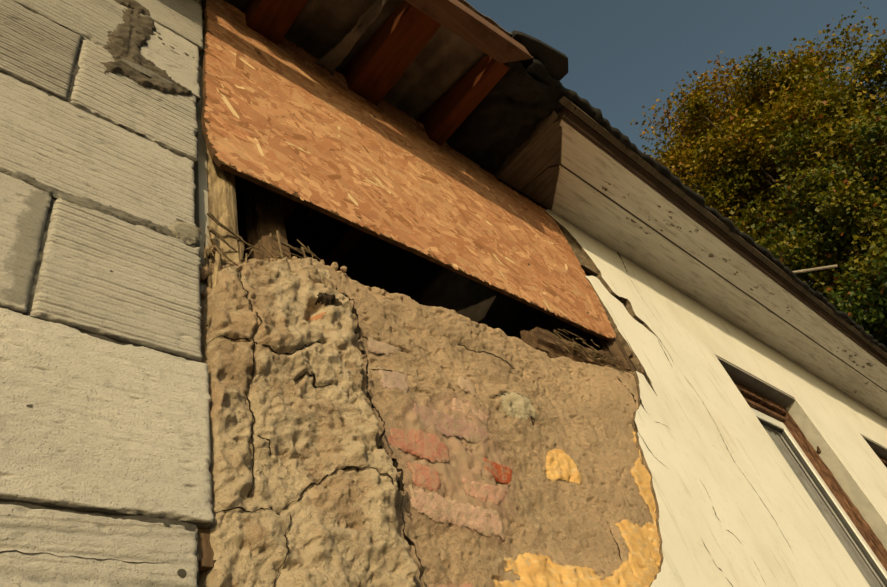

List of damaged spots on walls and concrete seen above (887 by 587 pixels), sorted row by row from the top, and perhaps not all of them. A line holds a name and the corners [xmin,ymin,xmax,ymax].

flaking render [367,337,401,356]
crack [457,344,514,369]
crack [201,270,425,587]
flaking render [377,368,516,542]
crack [618,363,669,469]
crack [0,550,180,564]
peeling [494,431,661,587]